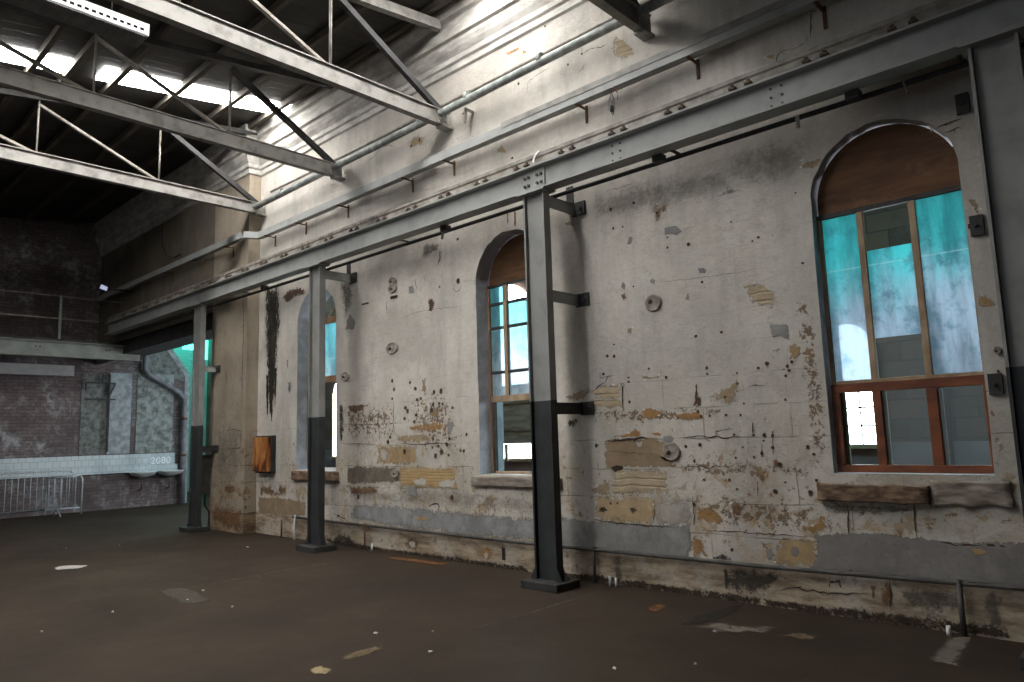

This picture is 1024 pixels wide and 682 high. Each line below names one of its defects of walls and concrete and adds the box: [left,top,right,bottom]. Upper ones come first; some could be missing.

water stain [264,287,291,422]
spalling [347,377,461,495]
spalling [568,380,807,525]
peeling [744,282,778,309]
peeling [789,302,826,463]
spalling [691,494,829,568]